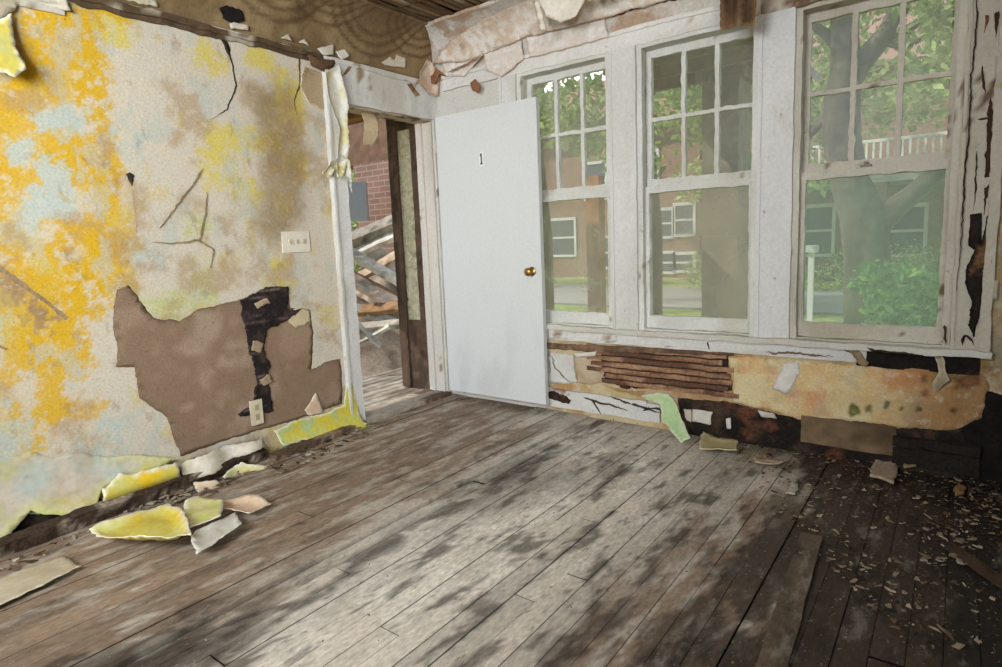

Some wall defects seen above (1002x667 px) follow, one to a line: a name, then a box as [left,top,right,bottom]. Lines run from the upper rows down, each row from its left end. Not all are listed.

crack [211,40,237,120]
peeling [431,19,609,93]
crack [131,168,214,267]
crack [0,266,69,320]
spalling [113,285,343,456]
peeling [547,351,777,425]
mould [849,404,871,416]
spalling [956,391,1002,485]